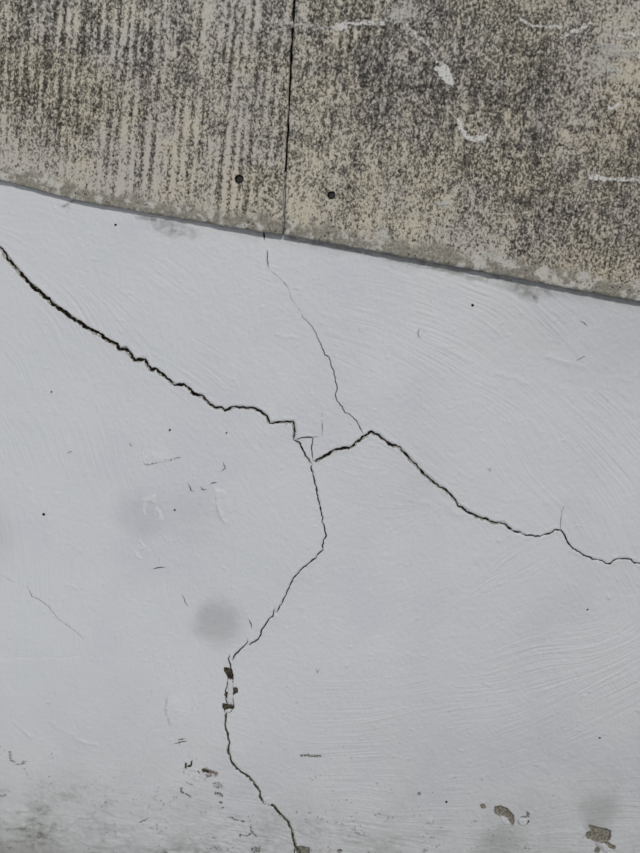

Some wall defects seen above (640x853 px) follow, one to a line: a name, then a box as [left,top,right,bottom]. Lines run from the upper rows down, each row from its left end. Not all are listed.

crack [0,233,640,853]
peeling [181,761,217,782]
spalling [480,804,515,826]
spalling [585,825,616,853]